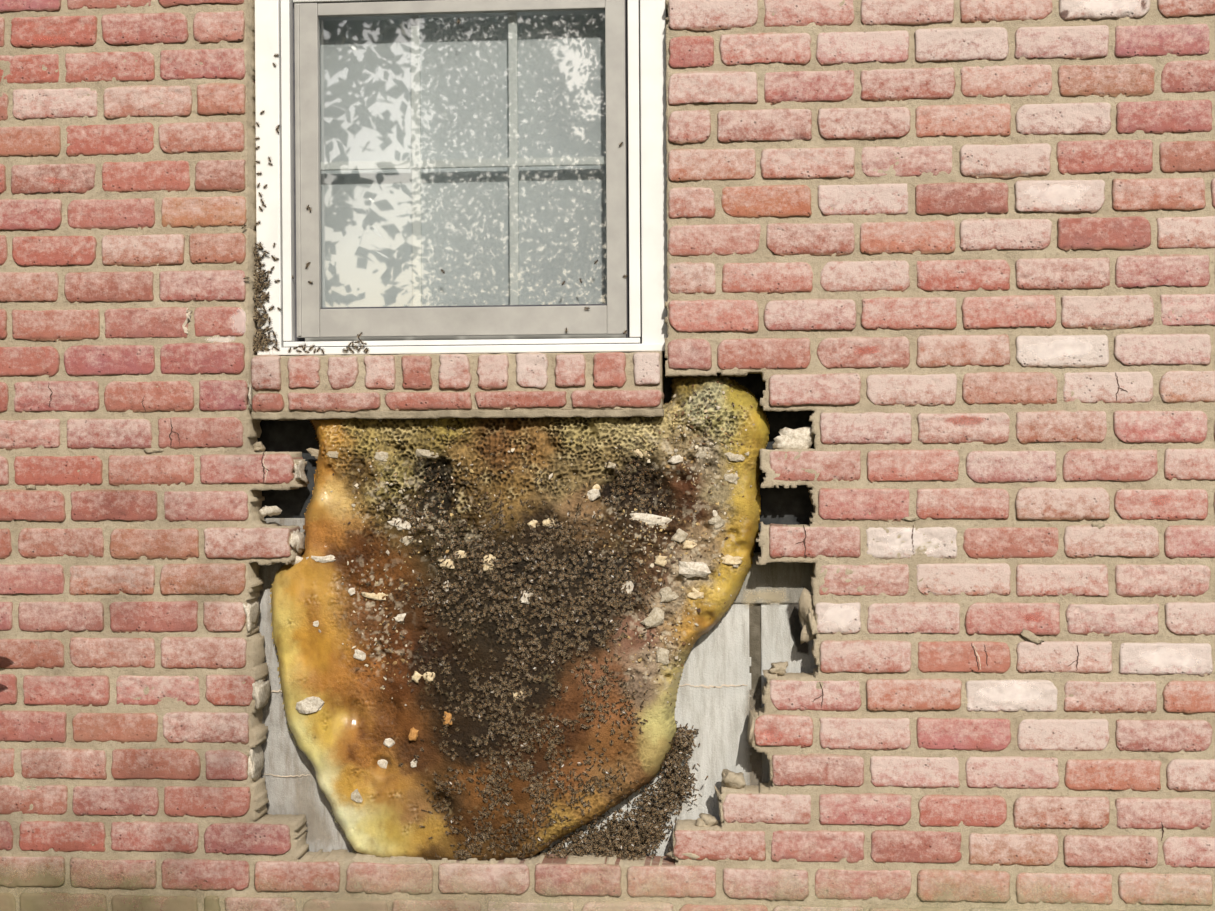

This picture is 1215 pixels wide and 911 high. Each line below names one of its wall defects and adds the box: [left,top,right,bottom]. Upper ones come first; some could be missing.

crack [261,451,269,482]
spalling [587,484,601,501]
spalling [387,518,414,546]
peeling [527,518,555,528]
spalling [292,555,335,565]
peeling [438,550,467,592]
spalling [640,528,743,629]
peeling [348,588,388,601]
crack [971,643,988,670]
peeling [411,671,435,683]
spalling [296,696,324,714]
peeling [377,727,419,769]